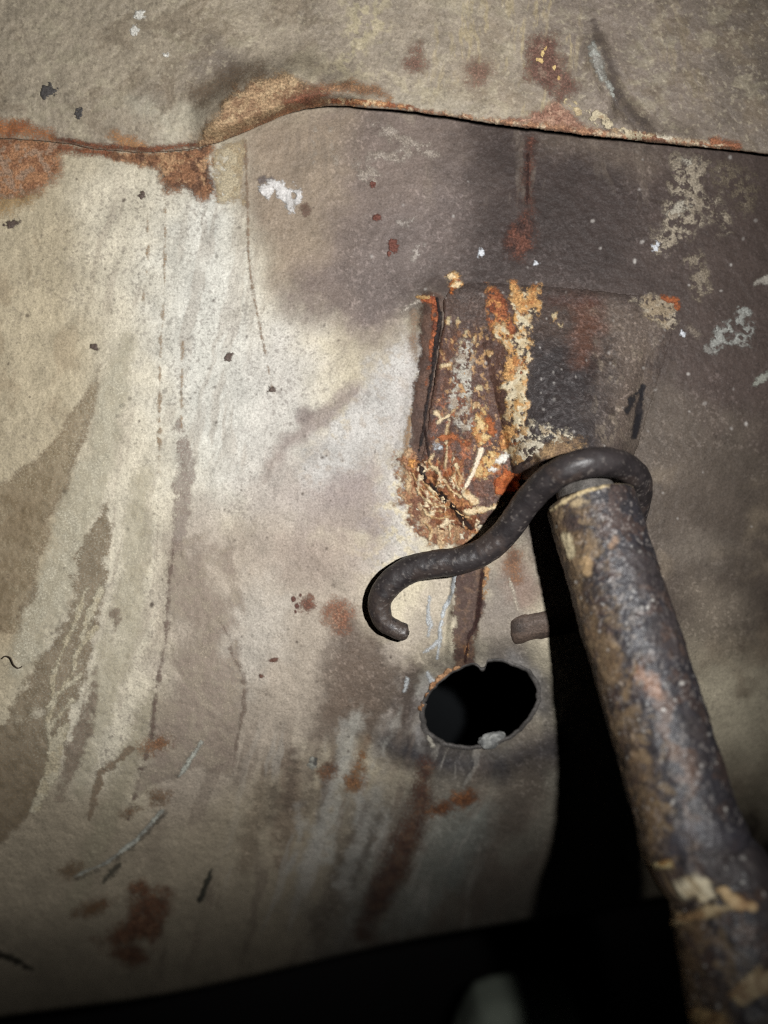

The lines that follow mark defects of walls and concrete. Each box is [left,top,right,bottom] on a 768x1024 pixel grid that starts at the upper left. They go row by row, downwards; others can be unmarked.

rust [0,120,215,215]
rust [408,35,742,259]
water stain [244,143,266,353]
rust [485,286,515,340]
rust [395,447,479,549]
rust [494,470,521,499]
water stain [0,338,246,910]
rust [418,567,490,711]
rust [101,880,169,967]